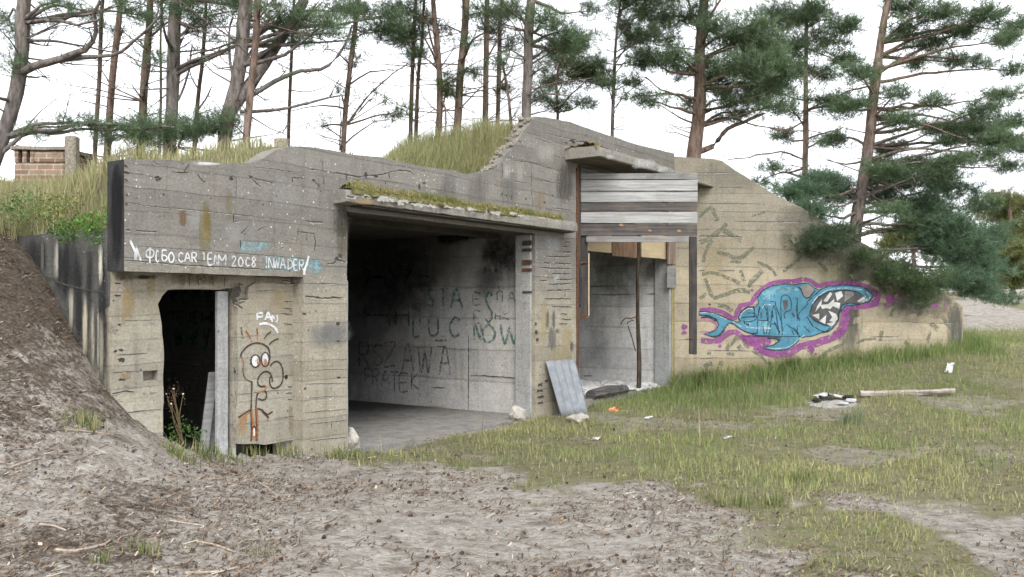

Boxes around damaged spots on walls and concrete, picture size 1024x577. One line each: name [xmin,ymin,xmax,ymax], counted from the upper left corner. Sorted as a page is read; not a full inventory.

crack [125,167,415,336]